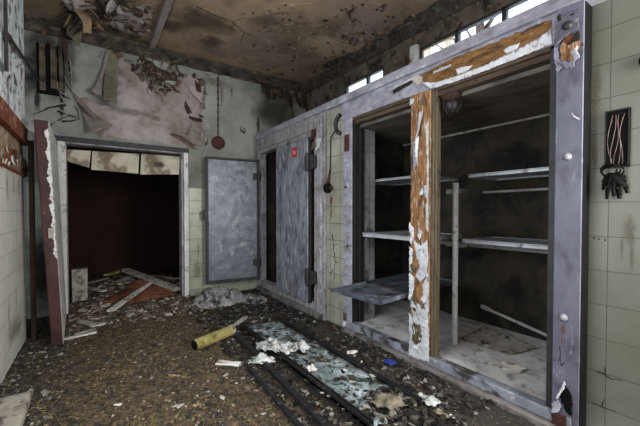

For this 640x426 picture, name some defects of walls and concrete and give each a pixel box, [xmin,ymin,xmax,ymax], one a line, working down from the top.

peeling [0,39,23,114]
peeling [40,0,154,64]
peeling [72,47,208,149]
peeling [392,8,580,94]
peeling [408,97,429,362]
peeling [551,381,573,426]